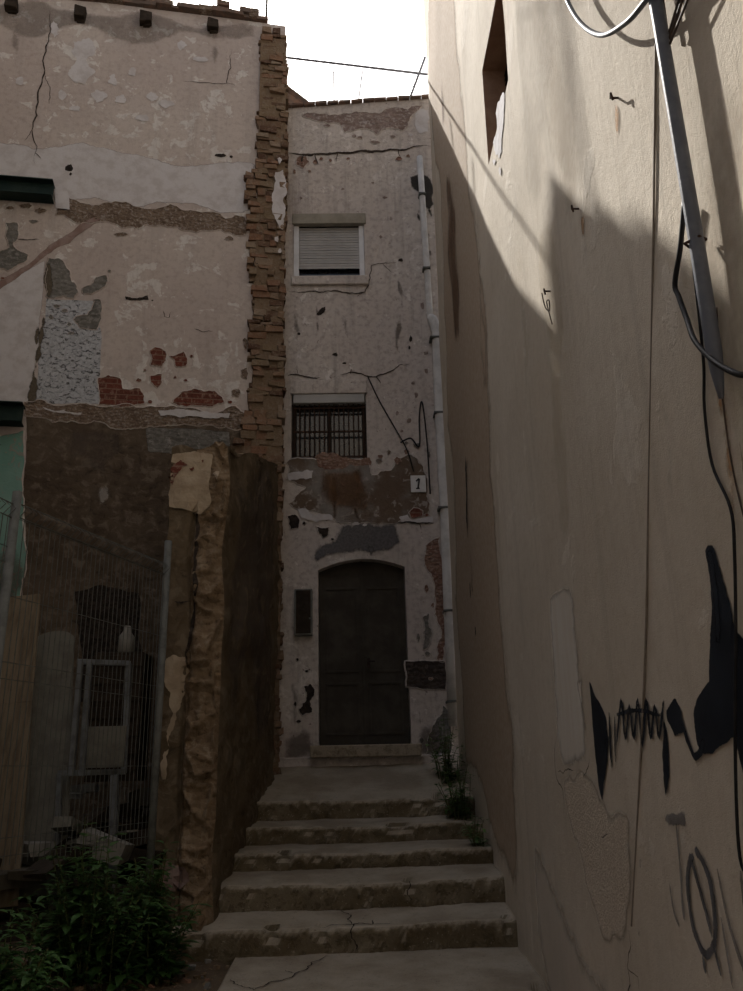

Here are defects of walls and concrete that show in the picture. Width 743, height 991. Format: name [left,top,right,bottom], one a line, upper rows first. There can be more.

crack [25,15,51,157]
crack [292,145,428,164]
spalling [0,197,249,280]
spalling [286,411,431,541]
flaking render [0,257,249,820]
flaking render [293,658,316,724]
crack [230,957,324,991]